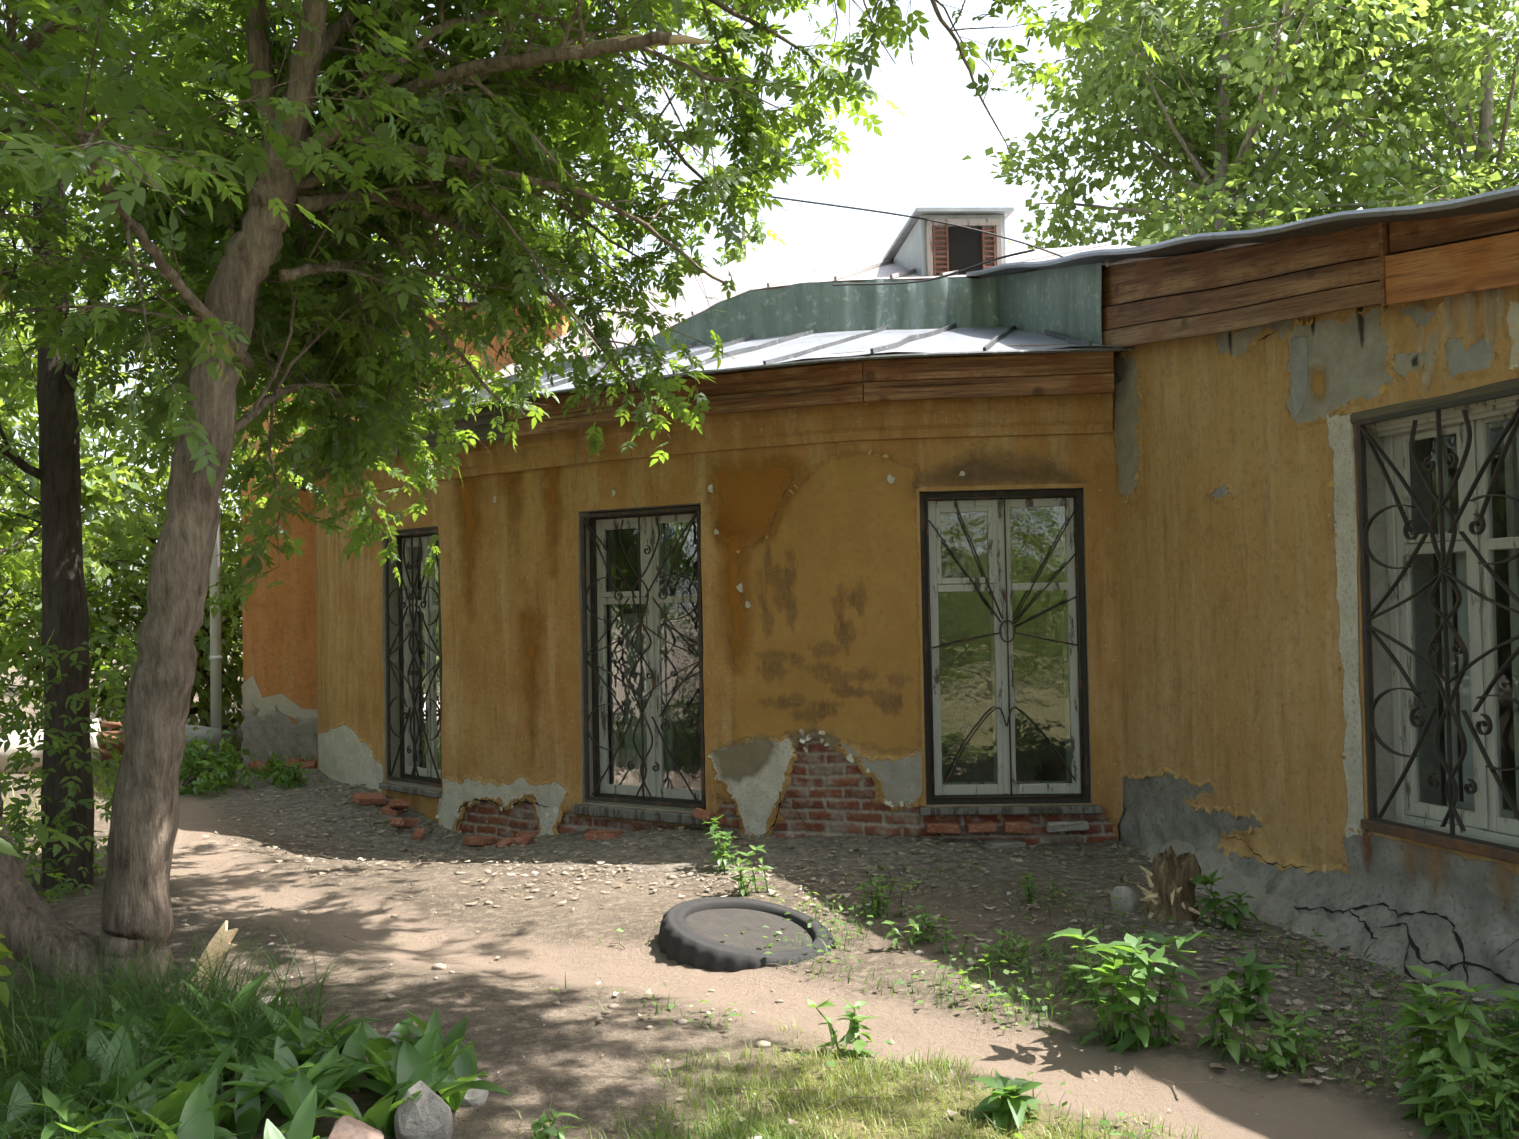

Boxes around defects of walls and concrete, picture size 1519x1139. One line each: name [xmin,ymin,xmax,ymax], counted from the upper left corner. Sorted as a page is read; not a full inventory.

peeling [435,294,1519,1003]
spalling [241,676,385,795]
crack [1226,836,1306,869]
crack [1294,902,1519,986]